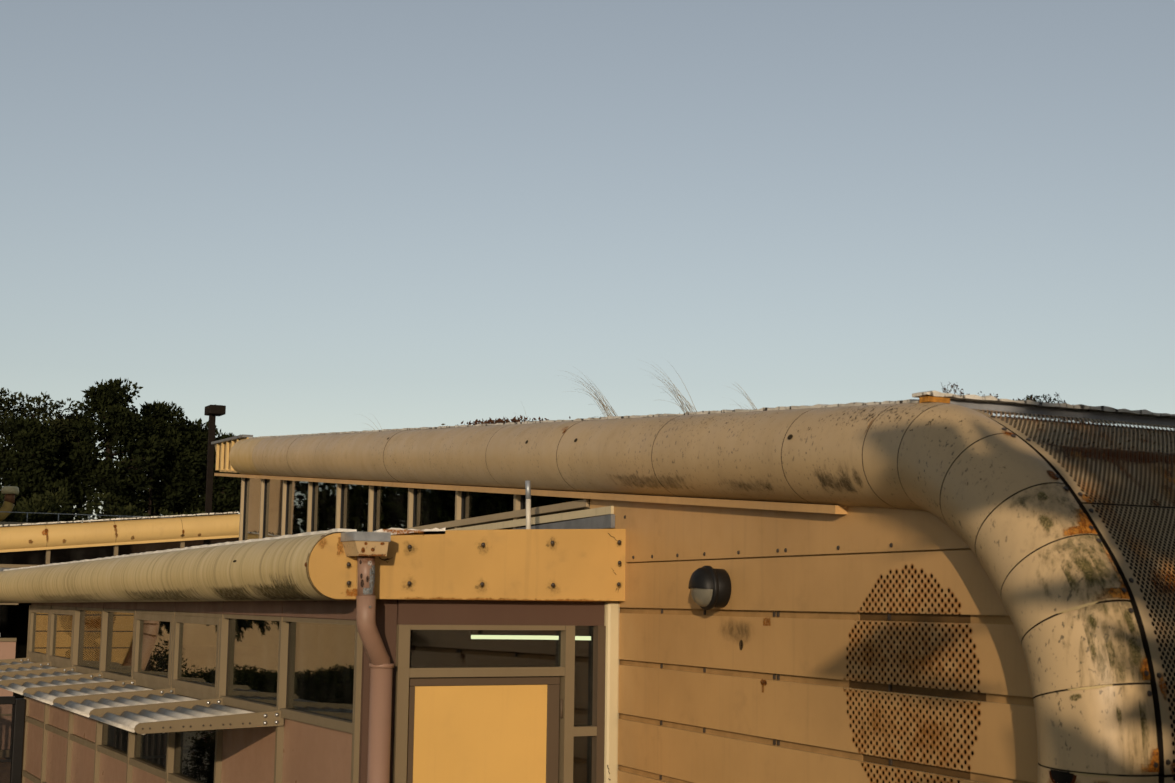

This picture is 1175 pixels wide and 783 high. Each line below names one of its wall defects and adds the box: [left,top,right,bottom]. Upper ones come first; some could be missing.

rust [1064,494,1097,536]
water stain [1062,535,1143,679]